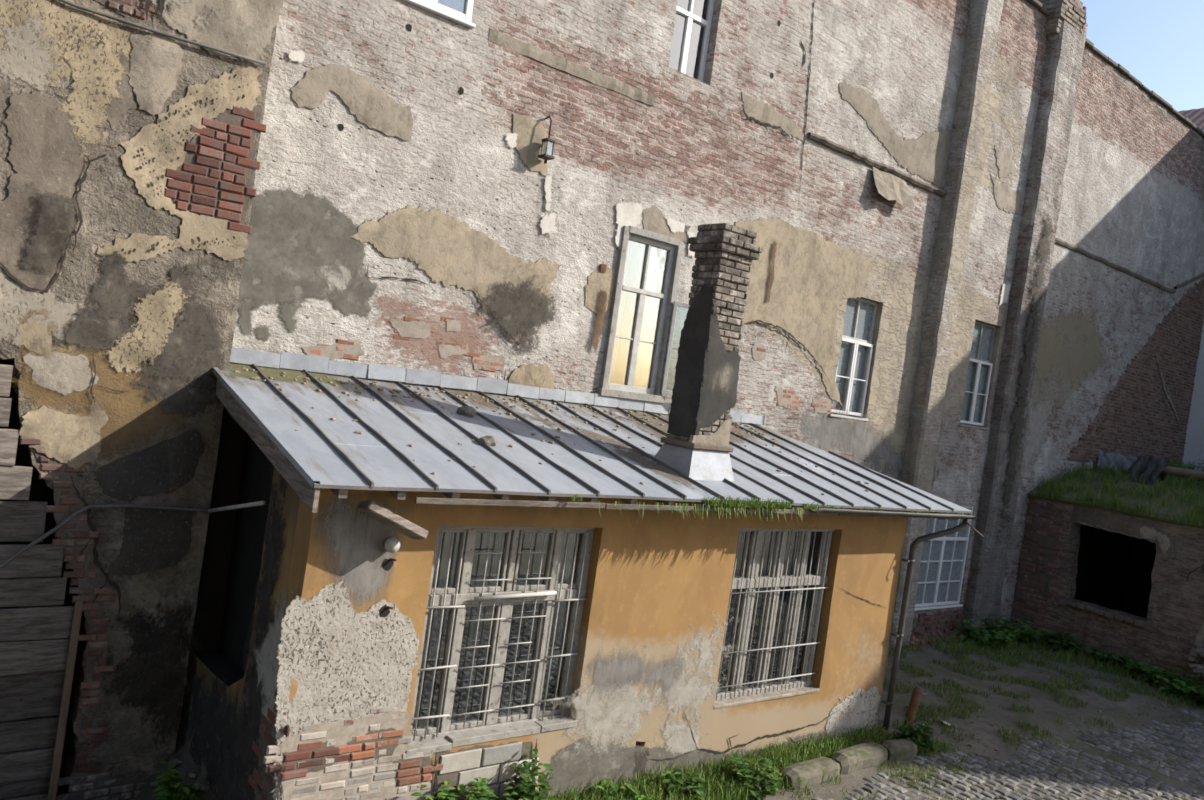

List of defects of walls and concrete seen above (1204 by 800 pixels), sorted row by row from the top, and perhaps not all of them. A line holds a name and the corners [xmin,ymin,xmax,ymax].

spalling [96,0,159,20]
spalling [164,105,267,234]
crack [742,0,815,205]
water stain [0,182,378,418]
spalling [386,316,505,372]
flaking render [350,205,561,345]
flaking render [735,217,872,414]
water stain [997,211,1106,541]
water stain [99,467,289,800]
peeling [248,581,444,800]
crack [651,710,839,761]